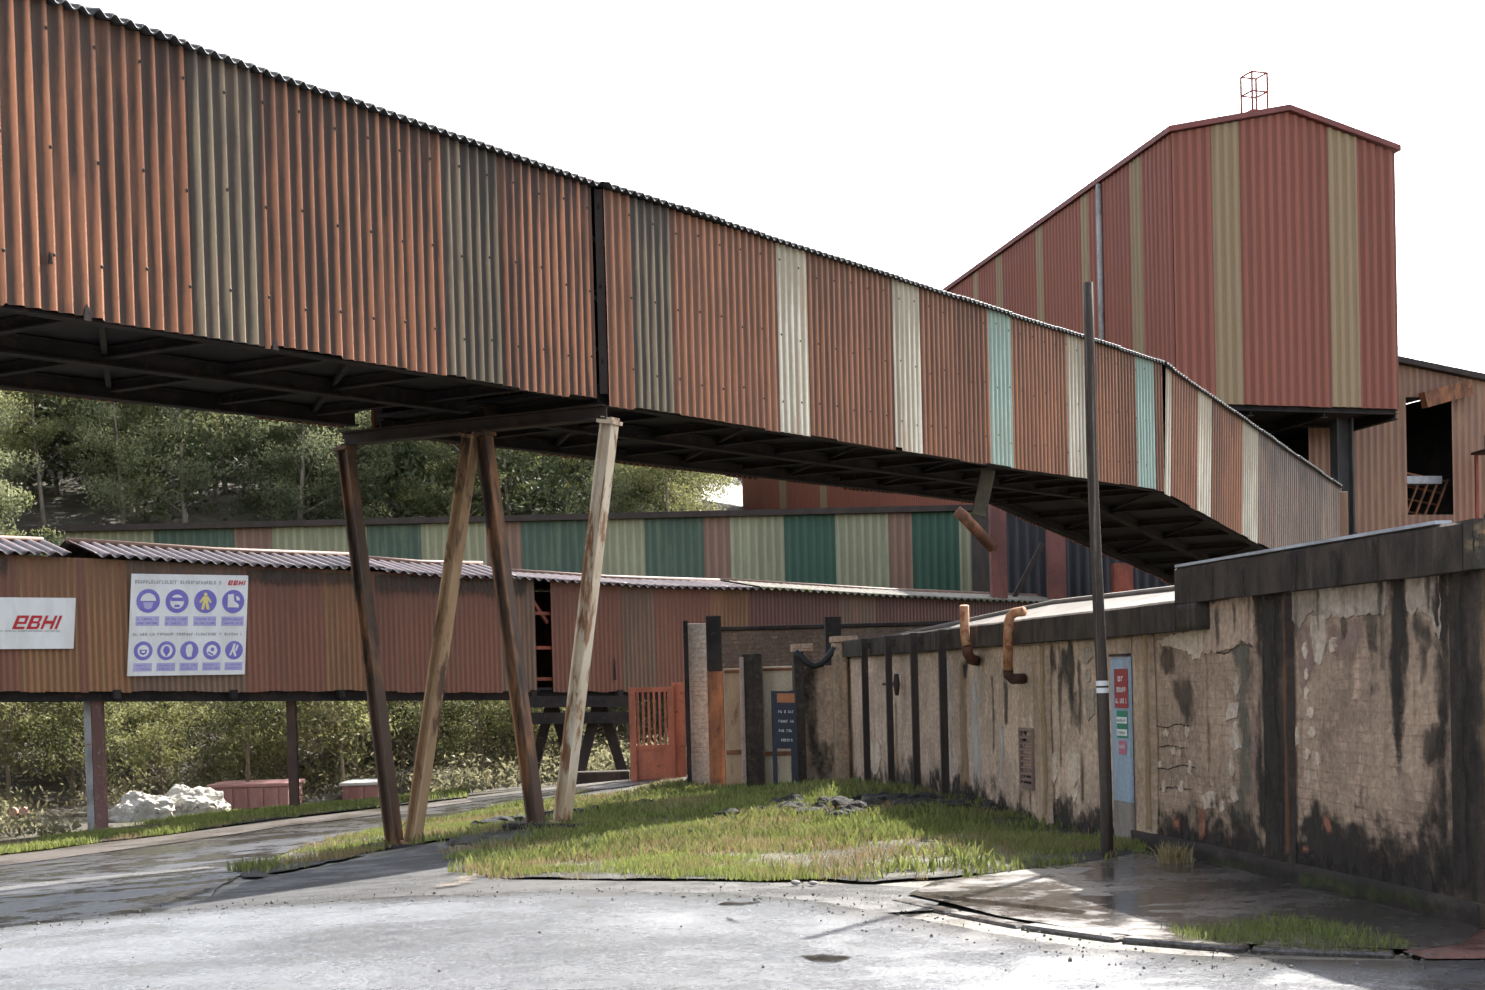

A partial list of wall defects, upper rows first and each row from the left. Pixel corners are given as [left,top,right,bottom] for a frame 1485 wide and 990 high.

peeling [1157,726,1192,794]
peeling [1198,673,1242,836]
water stain [1157,544,1485,896]
peeling [1292,576,1441,788]